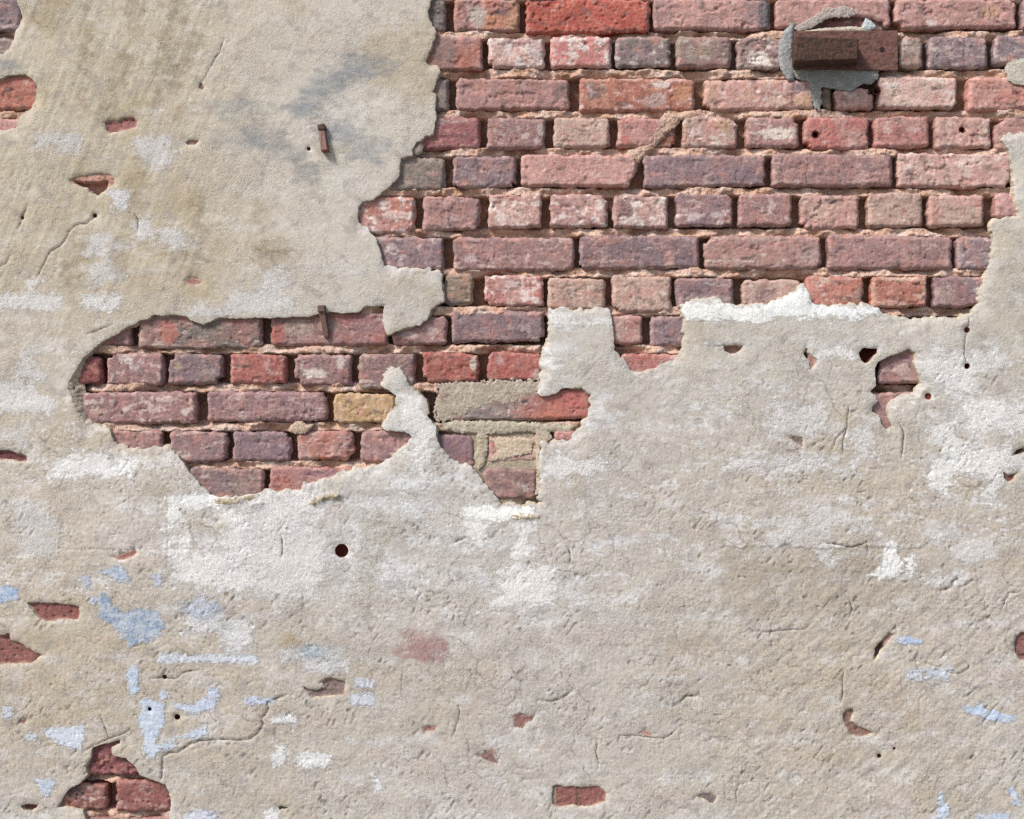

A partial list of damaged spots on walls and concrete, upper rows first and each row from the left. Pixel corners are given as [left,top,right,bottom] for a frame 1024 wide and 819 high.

spalling [68,0,1024,507]
spalling [27,596,98,622]
spalling [0,633,42,665]
spalling [57,740,171,819]
spalling [552,784,607,808]